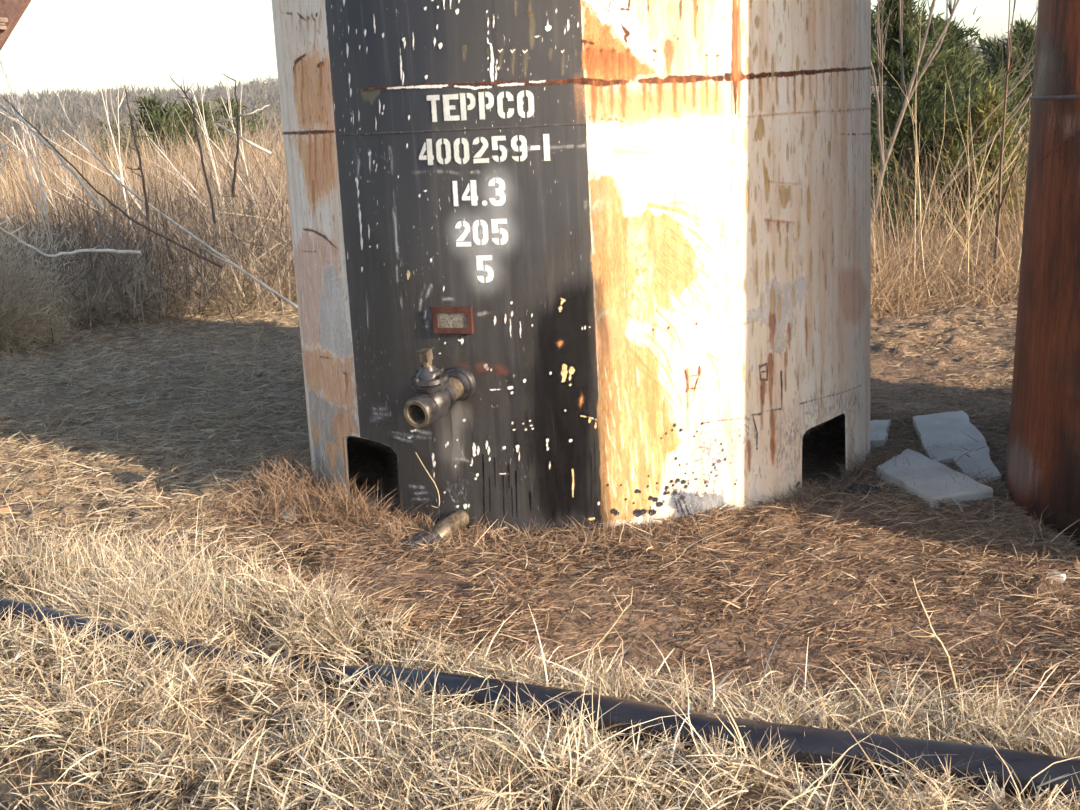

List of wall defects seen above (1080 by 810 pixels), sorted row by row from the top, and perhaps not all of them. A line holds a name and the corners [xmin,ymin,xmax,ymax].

corrosion [358,0,871,126]
corrosion [280,10,359,496]
peeling [549,364,575,386]
peeling [470,441,520,480]
peeling [597,415,750,521]